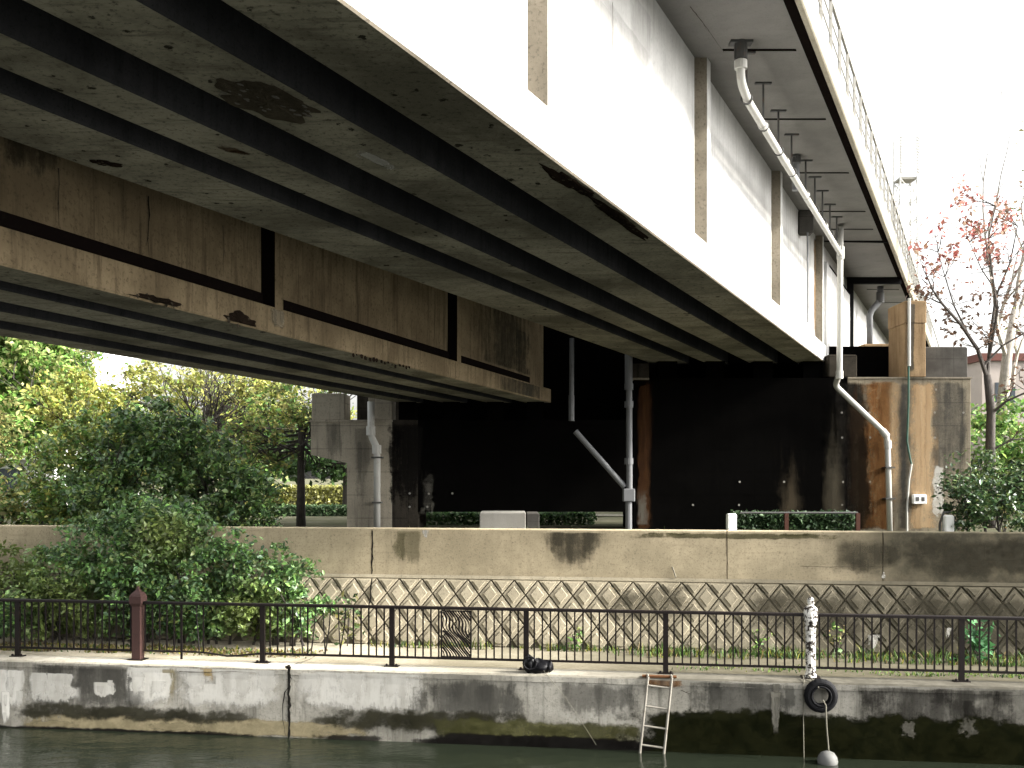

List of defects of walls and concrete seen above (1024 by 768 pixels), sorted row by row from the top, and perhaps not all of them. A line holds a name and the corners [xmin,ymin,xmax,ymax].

spalling [214,78,321,124]
spalling [539,163,649,241]
spalling [127,293,182,309]
spalling [223,310,256,328]
corrosion [638,383,652,529]
corrosion [847,382,893,529]
damp [833,383,1024,578]
crack [367,530,375,605]
damp [551,533,598,562]
damp [0,681,658,751]
damp [693,683,856,754]
damp [863,688,1012,759]